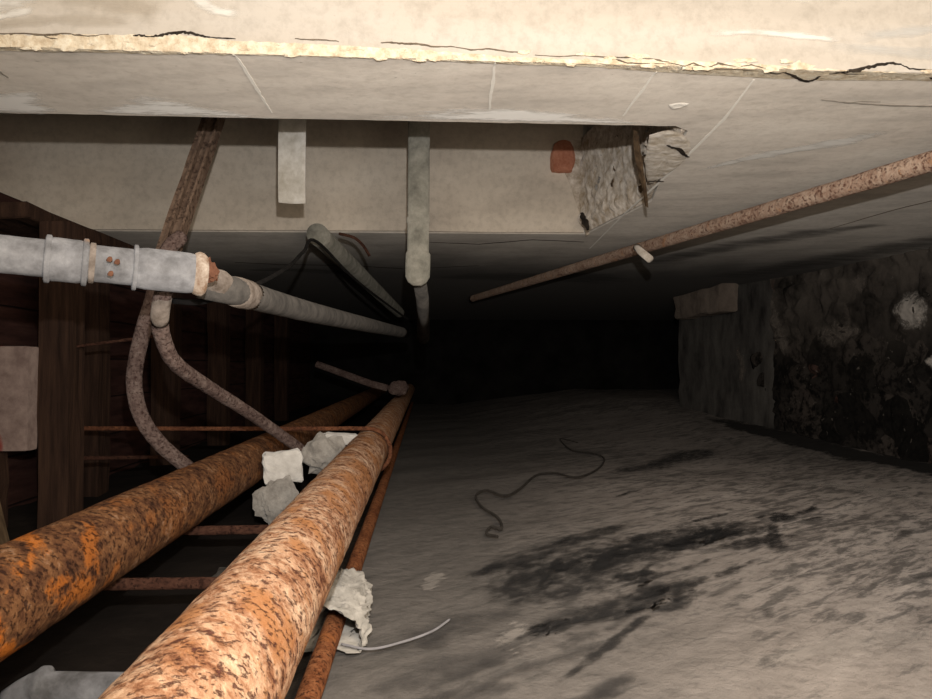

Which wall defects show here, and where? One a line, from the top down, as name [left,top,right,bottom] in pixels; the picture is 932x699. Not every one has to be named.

spalling [0,34,932,81]
spalling [550,125,691,236]
crack [381,41,932,249]
water stain [472,507,820,675]